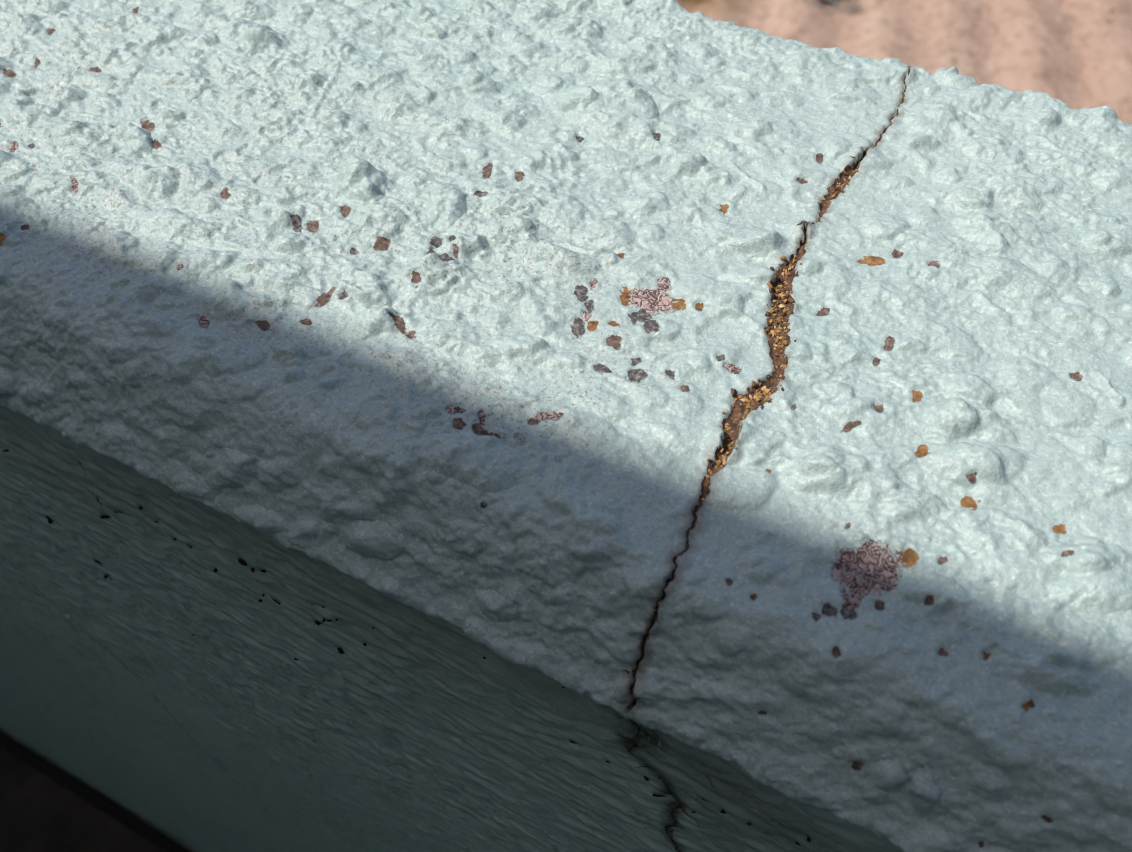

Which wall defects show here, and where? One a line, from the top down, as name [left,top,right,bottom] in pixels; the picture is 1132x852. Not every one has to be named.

spalling [570,276,704,349]
peeling [593,363,612,373]
peeling [626,357,648,383]
peeling [665,369,690,392]
peeling [715,352,742,373]
crack [615,69,910,852]
spalling [812,538,919,621]